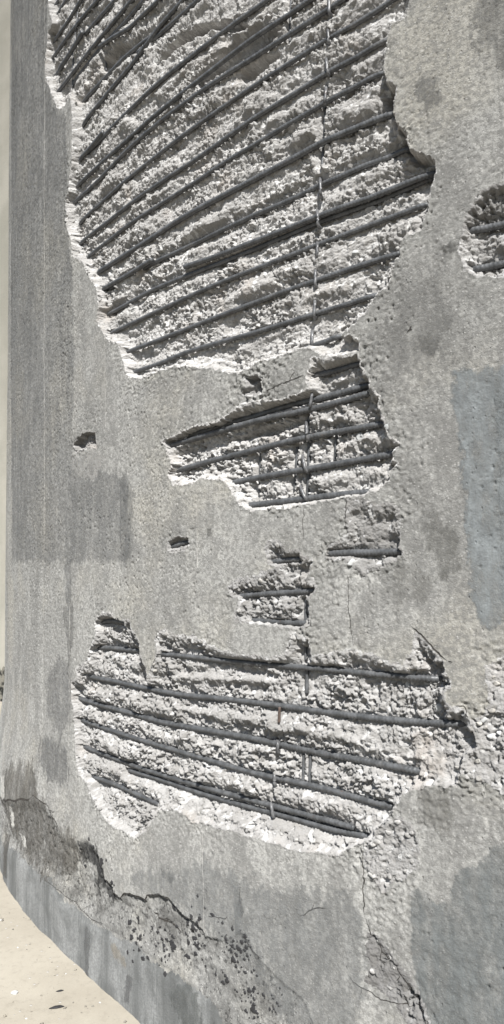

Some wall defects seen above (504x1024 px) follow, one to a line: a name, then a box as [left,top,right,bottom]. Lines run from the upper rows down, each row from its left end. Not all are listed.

spalling [45,0,504,894]
crack [2,795,59,830]
crack [46,867,260,958]
crack [347,853,426,1023]